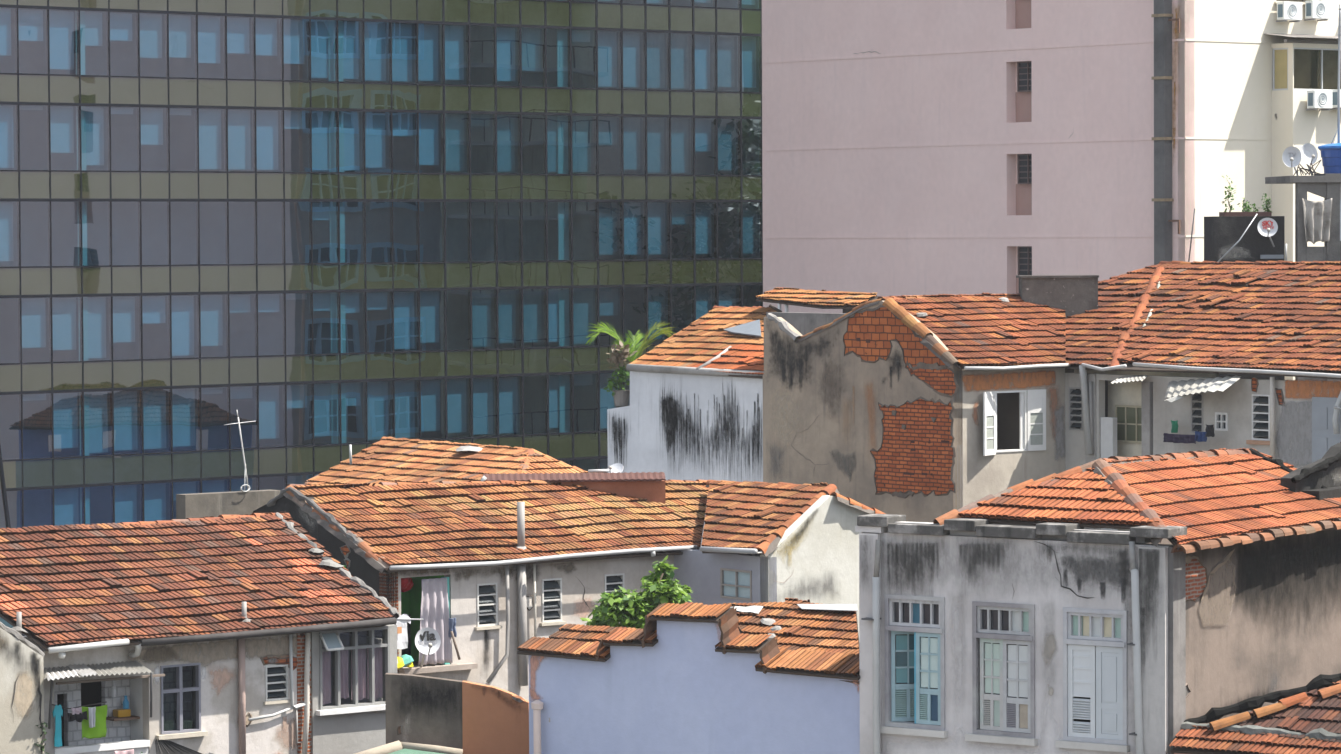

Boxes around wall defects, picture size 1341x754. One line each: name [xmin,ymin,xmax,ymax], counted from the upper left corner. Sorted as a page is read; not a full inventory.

water stain [770,332,829,387]
water stain [609,413,627,464]
water stain [661,385,781,482]
flaking render [843,305,1066,498]
water stain [887,544,934,583]
water stain [1118,548,1158,659]
peeling [1186,549,1236,626]
water stain [1227,530,1341,612]